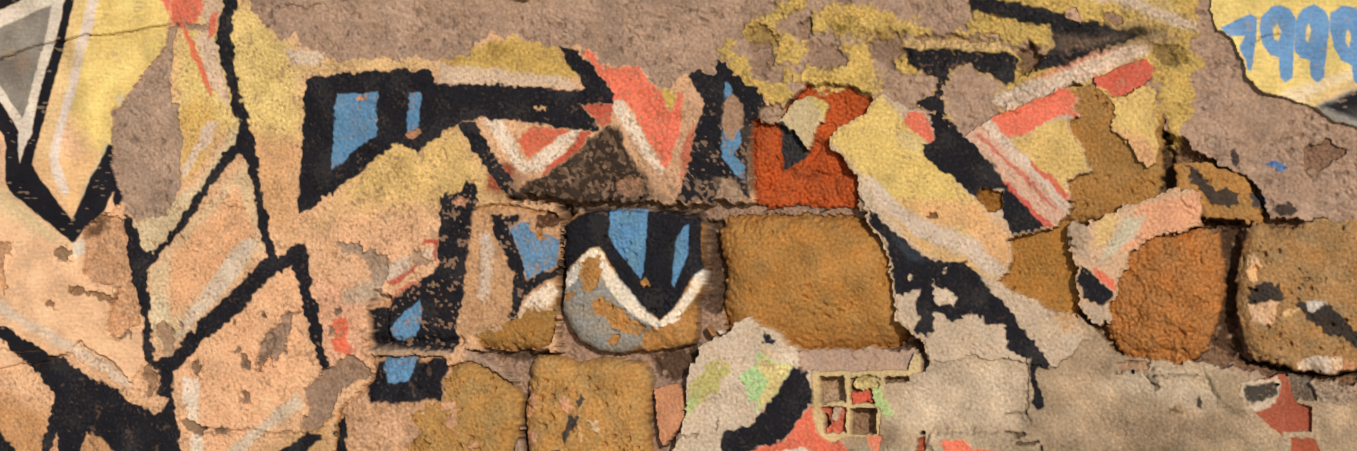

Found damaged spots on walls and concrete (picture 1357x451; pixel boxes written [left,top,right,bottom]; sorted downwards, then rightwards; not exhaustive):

peeling [722,94,744,140]
spalling [1303,138,1348,172]
spalling [54,22,210,399]
peeling [336,239,390,288]
spalling [534,207,567,241]
peeling [1102,166,1263,326]
peeling [471,255,702,352]
peeling [1246,254,1357,375]
peeling [556,394,601,451]
crack [1004,358,1044,451]
crack [1142,374,1199,388]
crack [1238,353,1357,381]